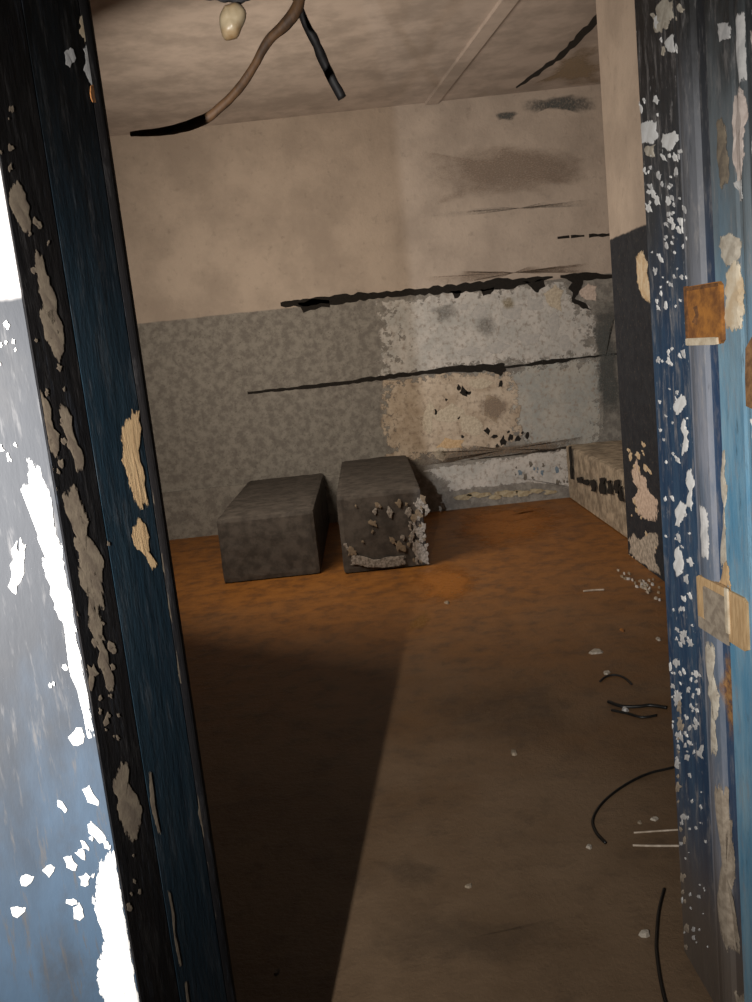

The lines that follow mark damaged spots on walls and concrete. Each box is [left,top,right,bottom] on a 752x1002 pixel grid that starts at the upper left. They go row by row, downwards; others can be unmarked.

crack [516,14,597,88]
peeling [716,12,752,201]
peeling [31,240,64,371]
peeling [121,410,166,578]
crack [248,353,617,394]
crack [280,272,612,313]
damp [468,267,565,279]
spalling [375,282,731,612]
peeling [636,95,687,310]
peeling [719,233,745,331]
peeling [21,460,120,746]
peeling [669,624,720,860]